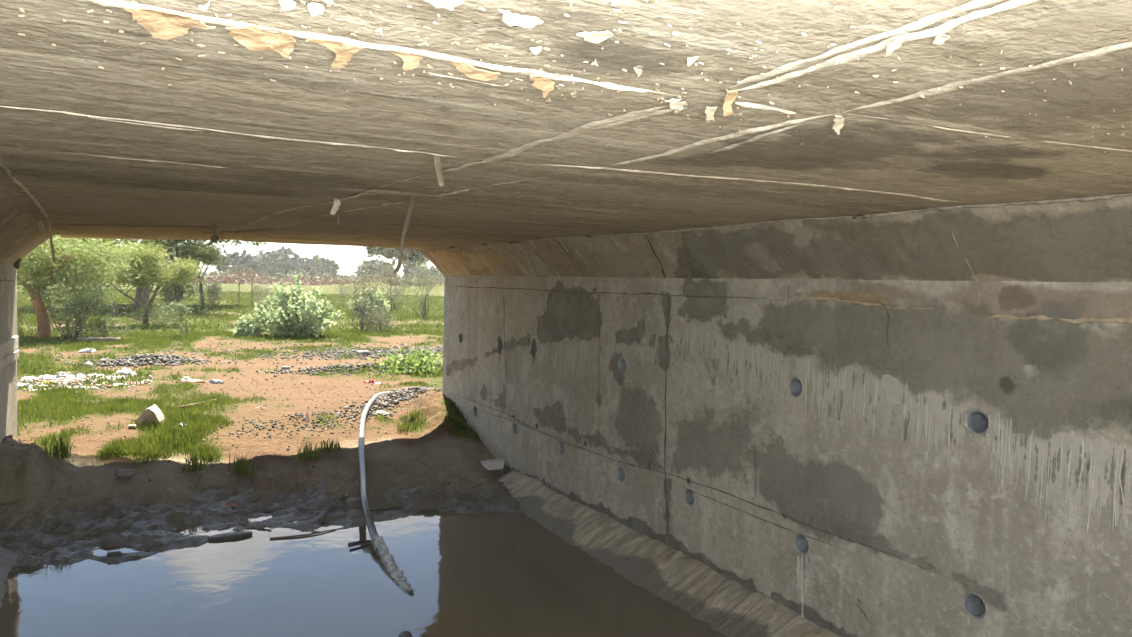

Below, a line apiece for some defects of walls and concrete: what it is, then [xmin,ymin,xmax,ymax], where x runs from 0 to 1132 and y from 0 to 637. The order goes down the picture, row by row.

peeling [87,0,364,82]
peeling [381,0,664,102]
peeling [644,83,691,120]
peeling [664,24,742,138]
peeling [832,115,844,135]
leakage [446,209,1132,637]